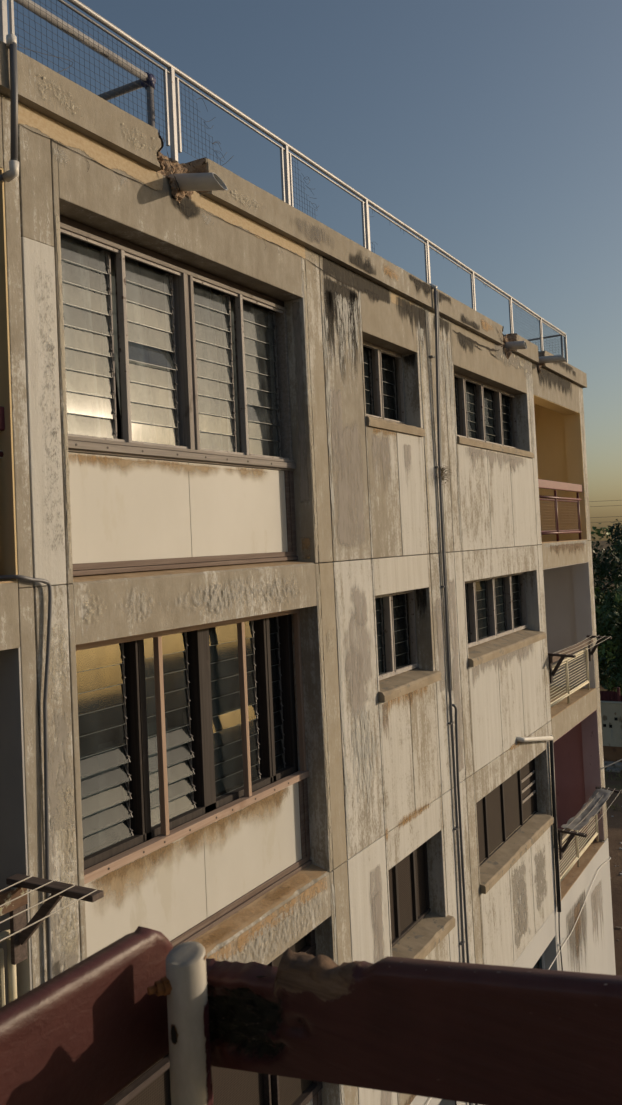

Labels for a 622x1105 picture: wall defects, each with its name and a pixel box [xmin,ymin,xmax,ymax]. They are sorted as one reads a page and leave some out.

crack [21,125,182,196]
crack [206,212,357,290]
peeling [18,102,323,570]
water stain [323,253,480,375]
peeling [323,294,362,545]
water stain [567,883,603,965]